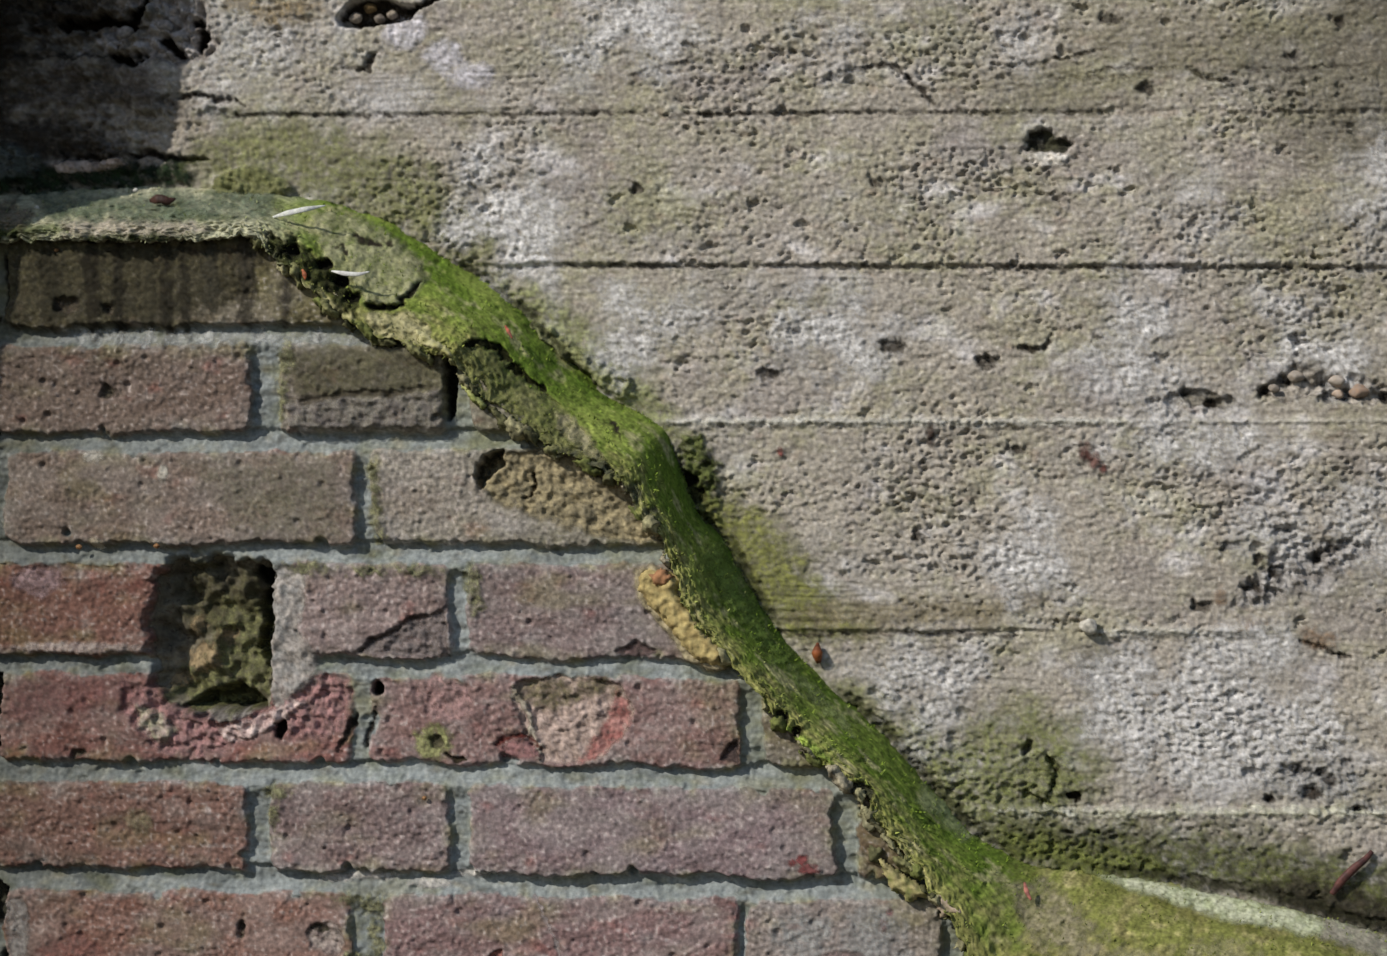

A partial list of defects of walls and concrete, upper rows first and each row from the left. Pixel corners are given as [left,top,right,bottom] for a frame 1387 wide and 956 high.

peeling [62,217,208,236]
damp [8,237,358,348]
damp [441,143,559,284]
spalling [276,211,732,668]
damp [770,282,898,374]
spalling [976,355,998,370]
damp [1080,289,1284,470]
damp [794,496,1067,630]
spalling [121,674,353,758]
spalling [499,675,634,763]
damp [1084,625,1343,794]
peeling [761,698,961,920]